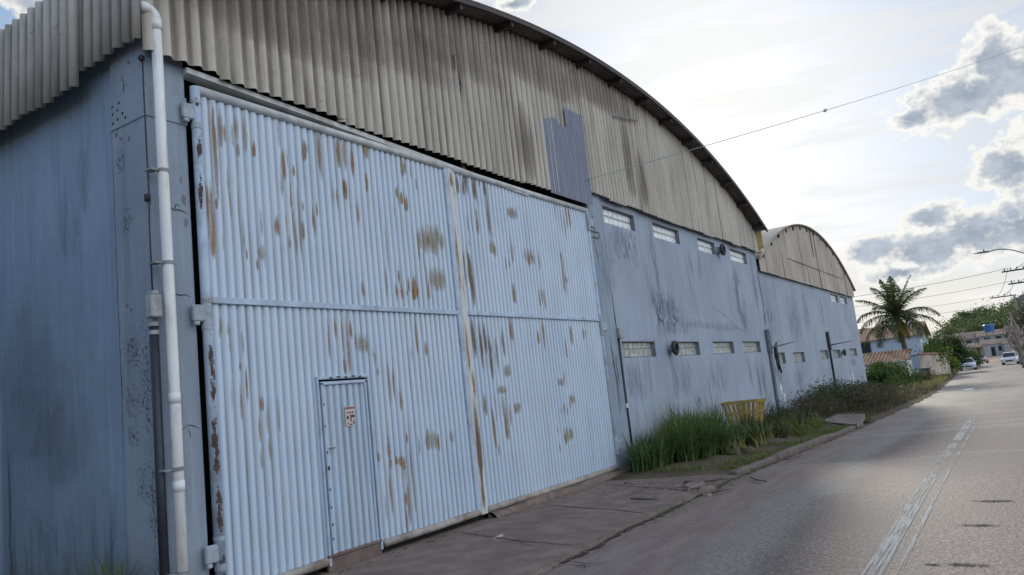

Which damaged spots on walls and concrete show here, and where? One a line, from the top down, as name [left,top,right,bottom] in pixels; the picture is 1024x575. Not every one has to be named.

corrosion [205,189,240,255]
corrosion [212,107,256,188]
corrosion [275,132,322,250]
corrosion [336,139,368,205]
corrosion [450,163,510,267]
corrosion [396,271,443,300]
corrosion [456,238,475,304]
corrosion [327,319,367,371]
corrosion [240,363,271,460]
corrosion [465,321,516,507]
corrosion [377,434,420,529]